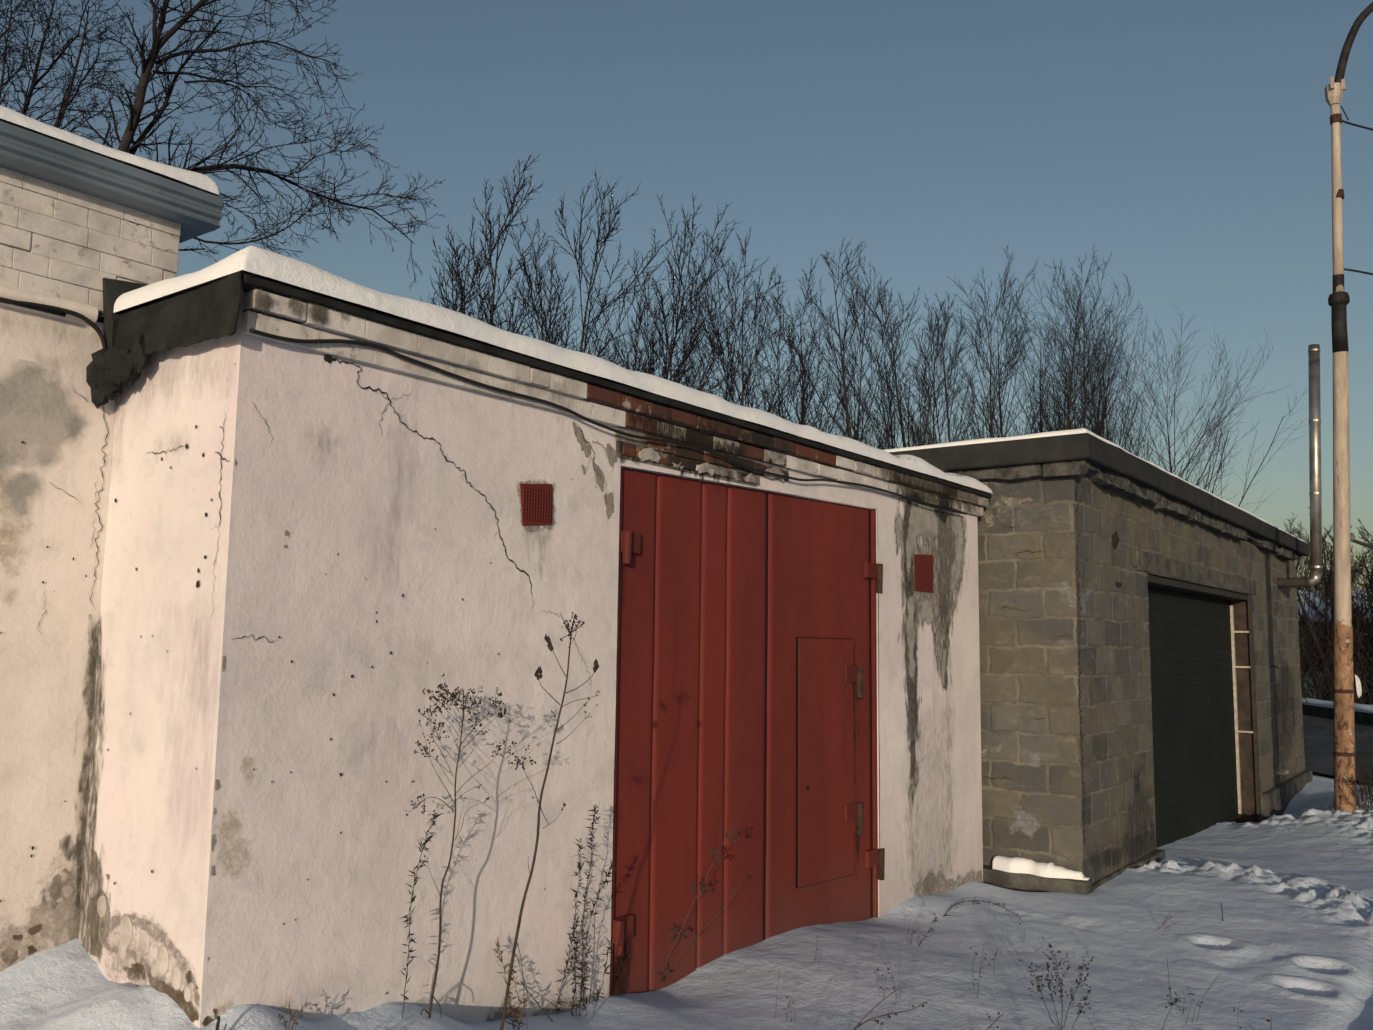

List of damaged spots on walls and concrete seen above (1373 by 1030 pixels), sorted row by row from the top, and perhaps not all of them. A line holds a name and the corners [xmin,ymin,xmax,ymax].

crack [49,389,109,610]
crack [210,402,275,643]
crack [311,316,591,685]
flaking render [573,422,789,519]
leakage [880,461,978,802]
leakage [0,614,199,1020]